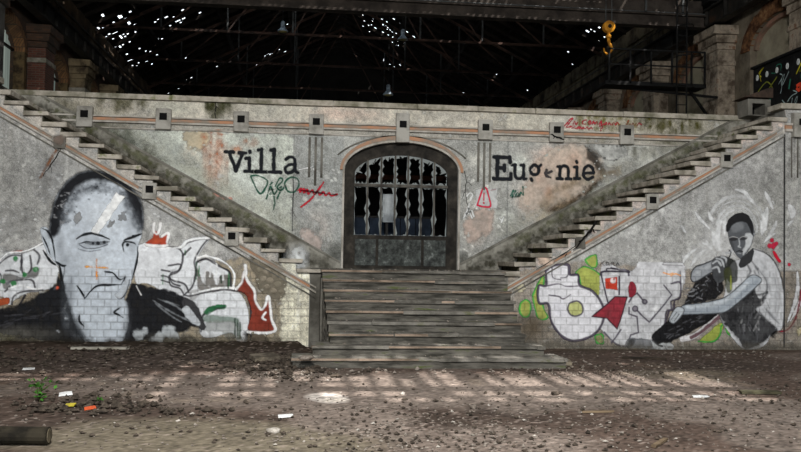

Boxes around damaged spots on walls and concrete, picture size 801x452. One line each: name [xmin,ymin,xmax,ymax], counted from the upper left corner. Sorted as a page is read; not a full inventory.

flaking render [520,142,628,208]